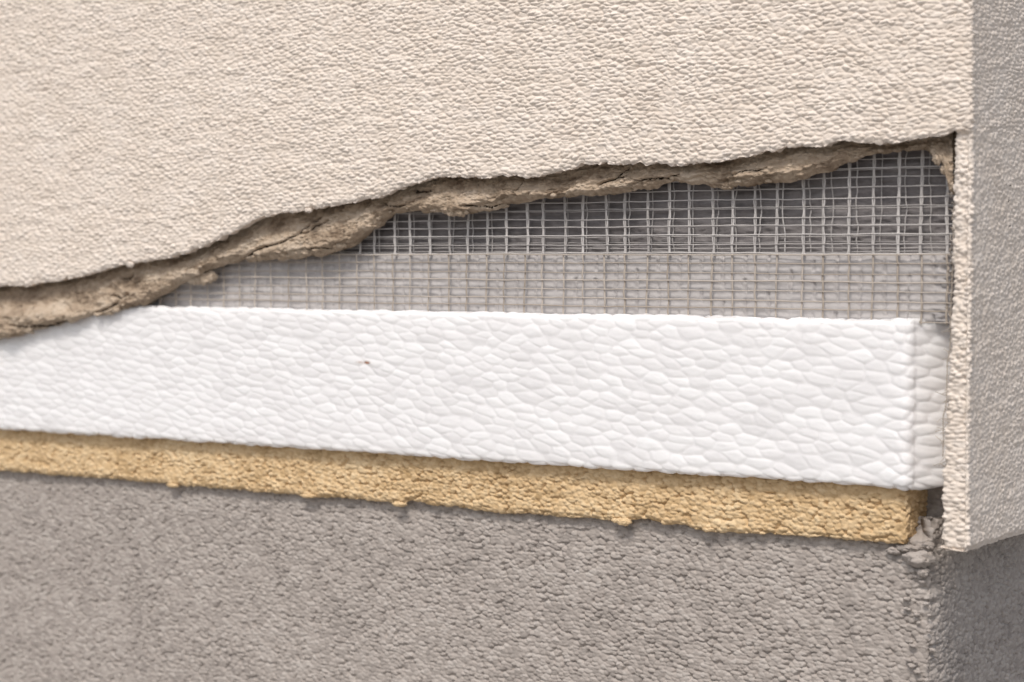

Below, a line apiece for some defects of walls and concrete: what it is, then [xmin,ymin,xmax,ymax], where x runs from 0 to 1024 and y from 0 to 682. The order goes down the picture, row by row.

spalling [0,131,957,467]